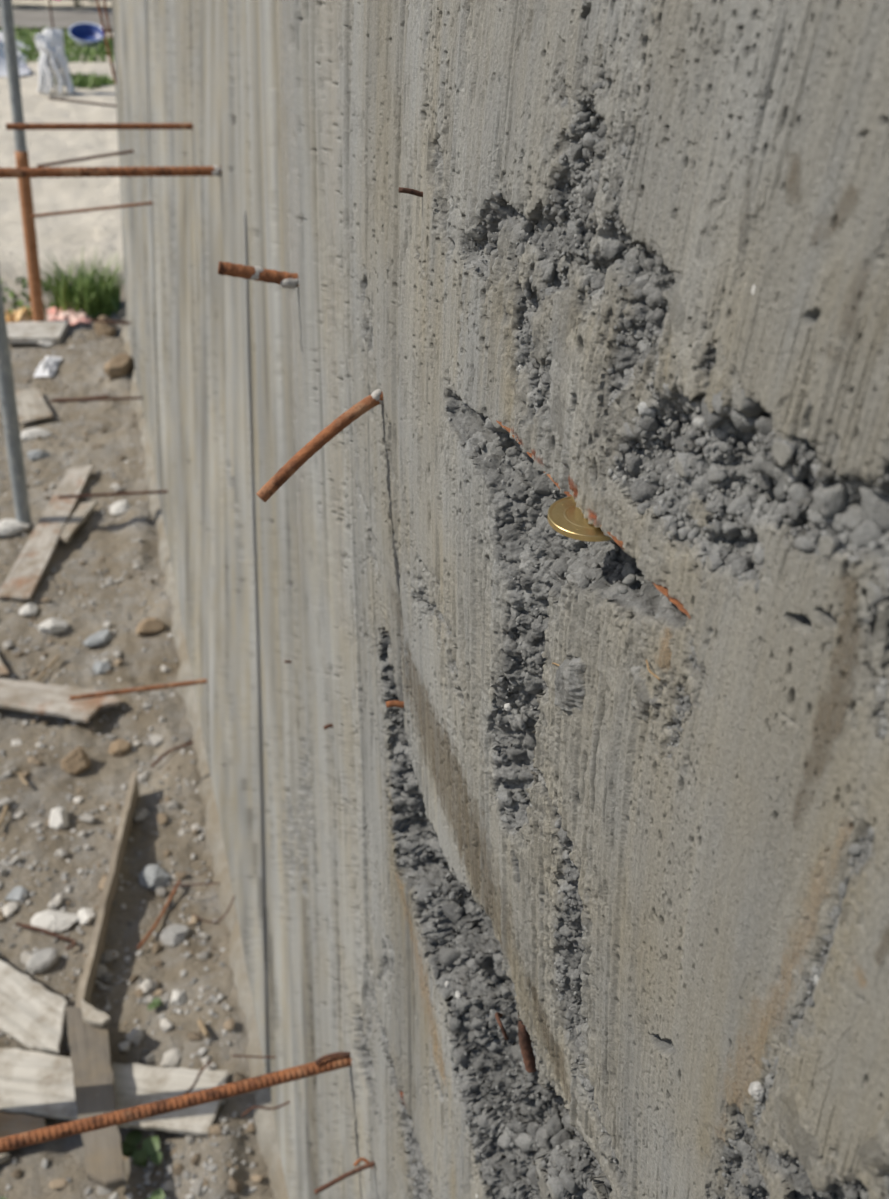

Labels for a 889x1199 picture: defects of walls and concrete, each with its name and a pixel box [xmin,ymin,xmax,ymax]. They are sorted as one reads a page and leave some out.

spalling [442,79,889,830]
spalling [403,558,467,712]
spalling [393,803,622,1199]
spalling [788,825,876,1048]
peeling [718,1047,869,1199]